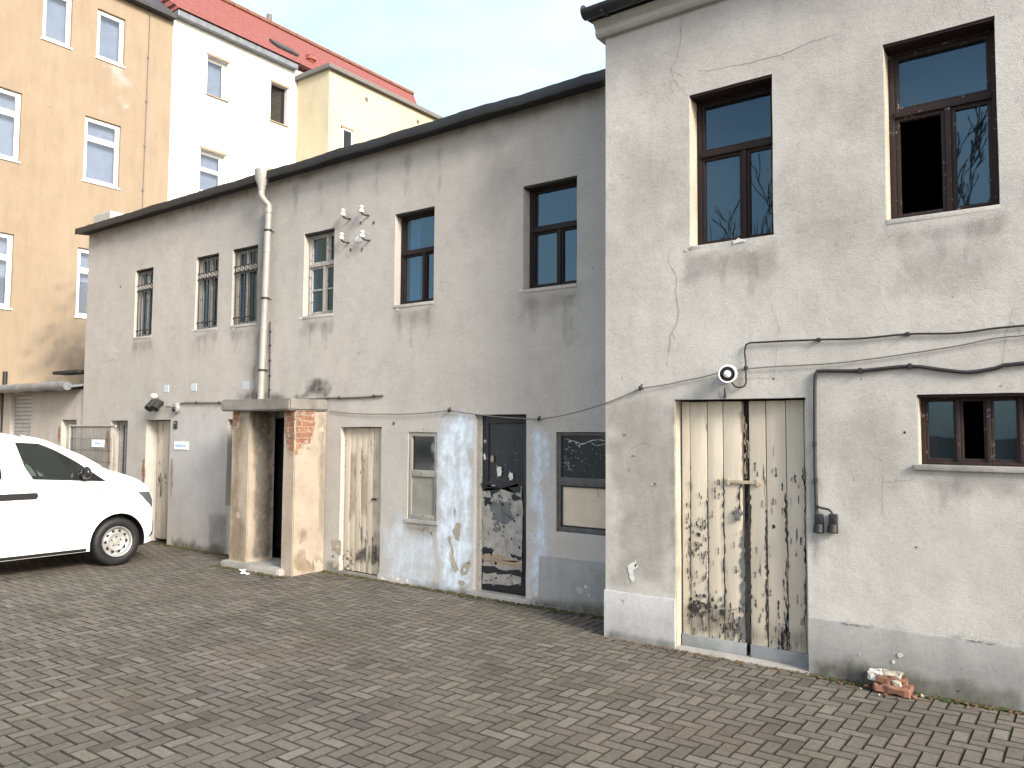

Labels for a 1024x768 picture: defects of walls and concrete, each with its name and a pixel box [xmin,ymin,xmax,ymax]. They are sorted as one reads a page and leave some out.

flaking render [284,410,316,456]
spalling [377,573,410,584]
flaking render [627,560,638,582]